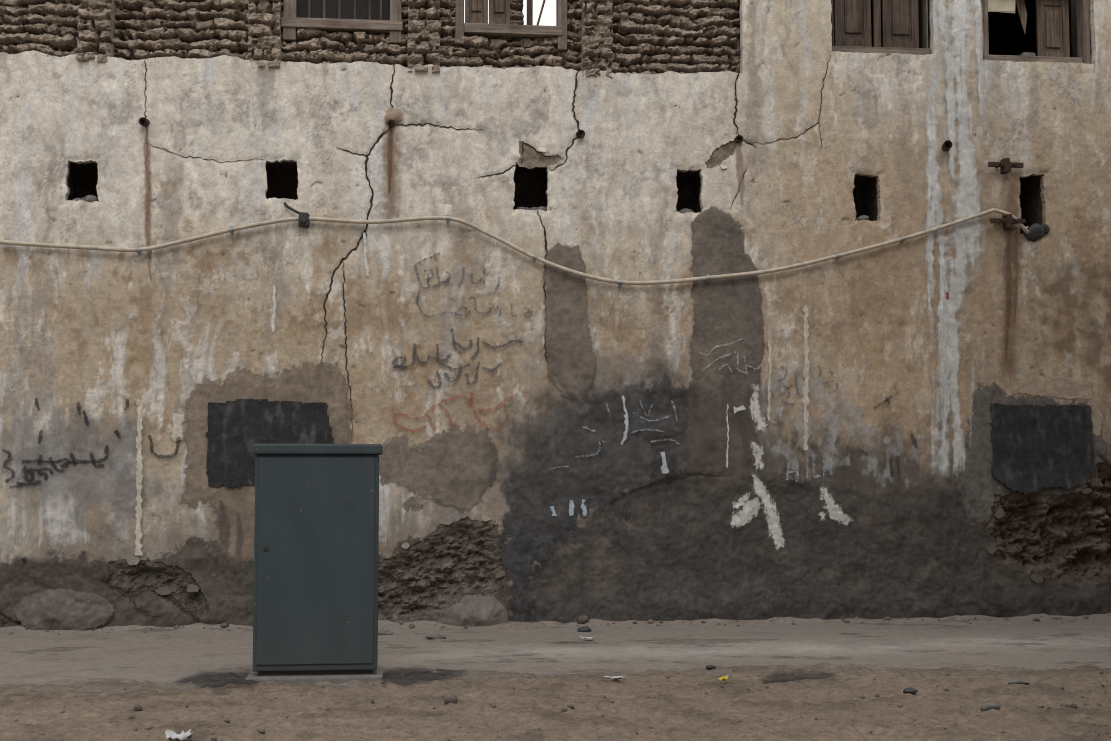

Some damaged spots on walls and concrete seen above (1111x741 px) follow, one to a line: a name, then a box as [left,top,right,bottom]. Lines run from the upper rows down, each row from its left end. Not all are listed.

flaking render [515,141,564,169]
flaking render [705,140,736,169]
crack [731,55,831,206]
crack [321,62,484,439]
water stain [433,0,1111,623]
corrosion [1003,183,1018,372]
flaking render [0,613,21,627]
water stain [0,372,254,627]
flaking render [107,557,209,613]
flaking render [378,516,506,623]
flaking render [984,462,1111,584]